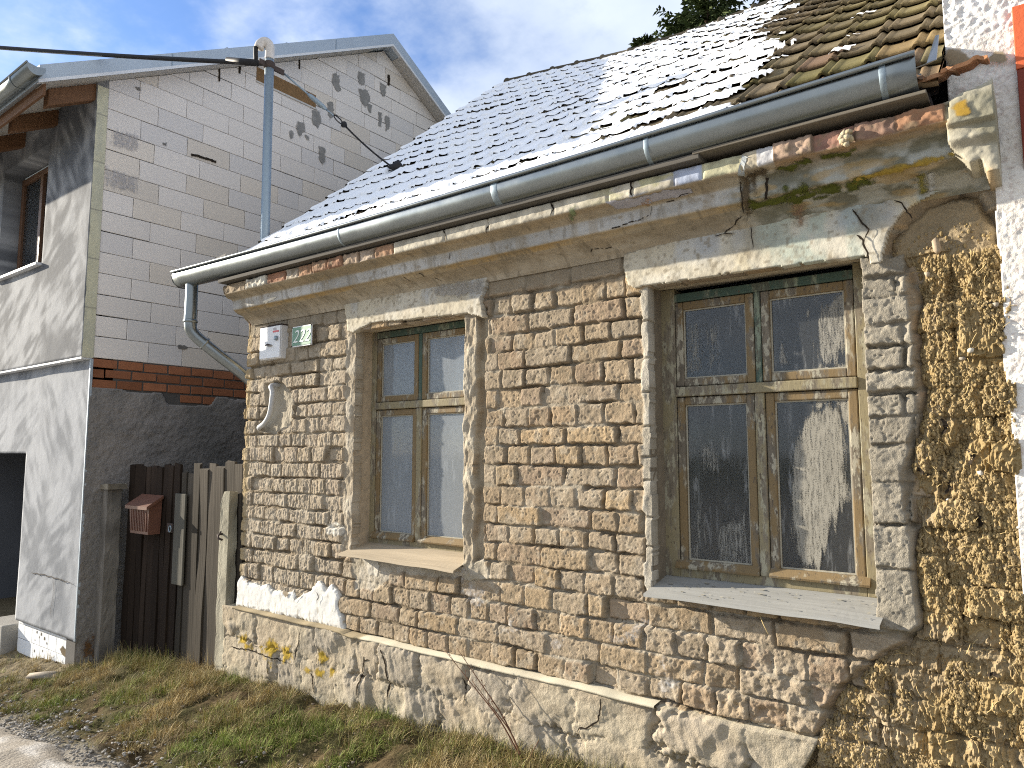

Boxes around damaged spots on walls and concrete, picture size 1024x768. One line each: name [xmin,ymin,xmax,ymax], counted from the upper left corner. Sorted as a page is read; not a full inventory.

crack [716,156,769,245]
leakage [739,168,766,215]
crack [852,209,870,261]
spalling [805,196,1024,768]